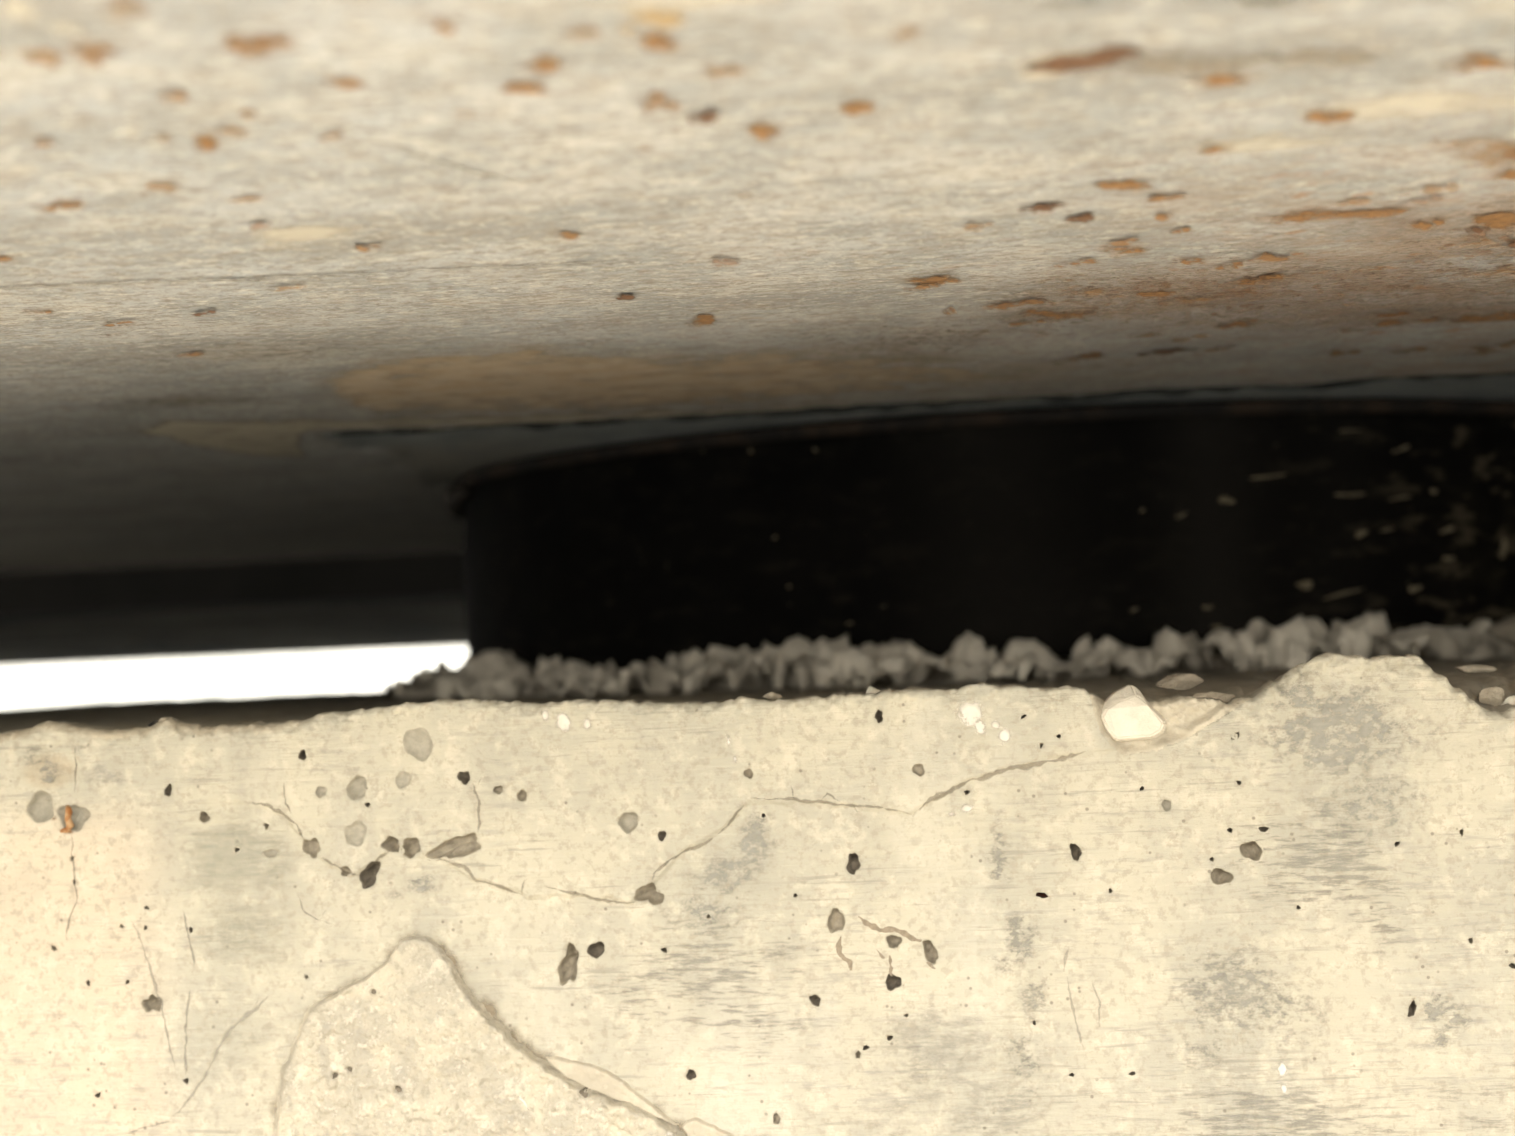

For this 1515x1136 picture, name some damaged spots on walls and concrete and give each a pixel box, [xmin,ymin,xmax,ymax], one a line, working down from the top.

corrosion [225,35,300,57]
corrosion [1029,46,1140,72]
corrosion [504,57,561,95]
corrosion [195,111,255,151]
corrosion [644,93,719,124]
corrosion [747,125,780,140]
corrosion [841,102,875,116]
corrosion [1304,111,1354,125]
corrosion [1018,203,1095,223]
corrosion [1096,180,1190,233]
corrosion [1273,184,1458,230]
corrosion [909,276,958,290]